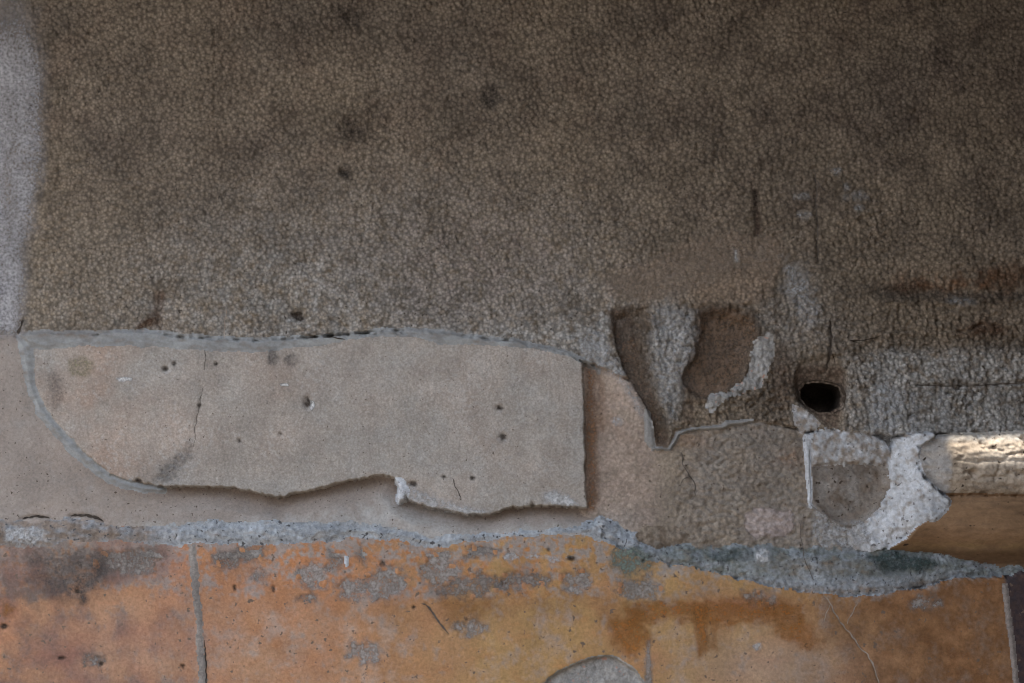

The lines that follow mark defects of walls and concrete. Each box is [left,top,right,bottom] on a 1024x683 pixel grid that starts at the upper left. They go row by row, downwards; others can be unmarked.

crack [193,309,227,447]
spalling [609,309,667,446]
spalling [679,305,775,413]
spalling [802,427,893,528]
spalling [542,655,645,683]
corrosion [612,600,810,655]